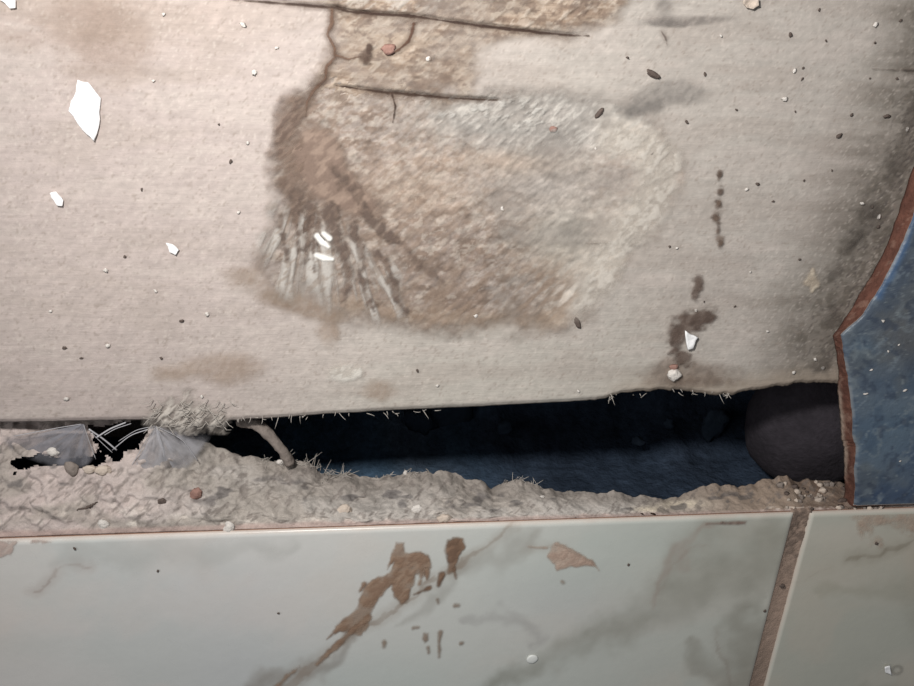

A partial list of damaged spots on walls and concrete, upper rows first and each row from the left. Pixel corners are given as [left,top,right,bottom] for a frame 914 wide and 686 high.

crack [244,0,589,123]